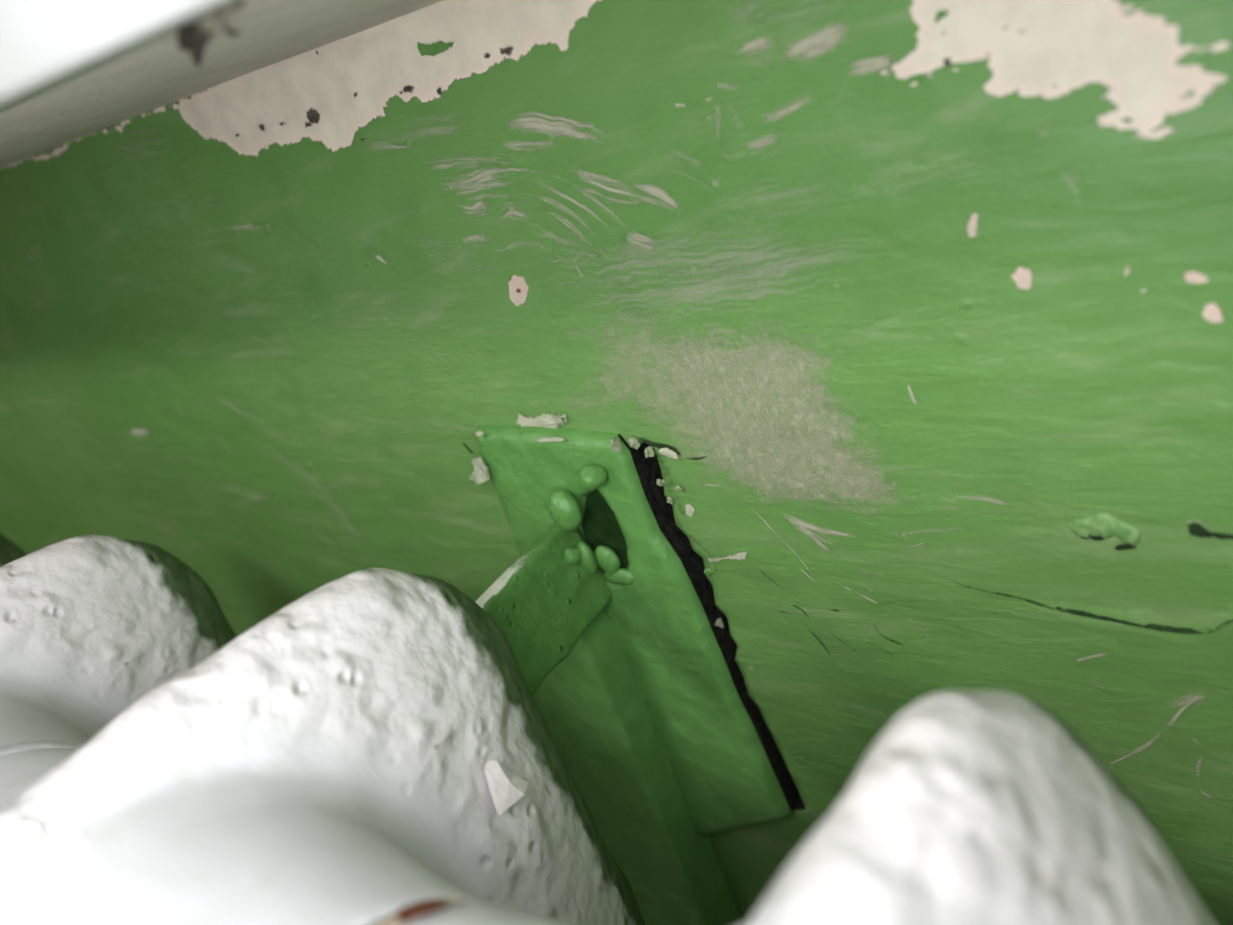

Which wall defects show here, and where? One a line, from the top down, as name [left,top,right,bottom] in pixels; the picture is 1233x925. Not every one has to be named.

peeling [0,0,601,169]
peeling [881,0,1229,139]
peeling [967,213,978,237]
peeling [508,275,529,306]
peeling [1011,267,1032,289]
peeling [1184,271,1209,284]
crack [610,437,705,504]
crack [715,618,724,629]
crack [955,582,1233,634]